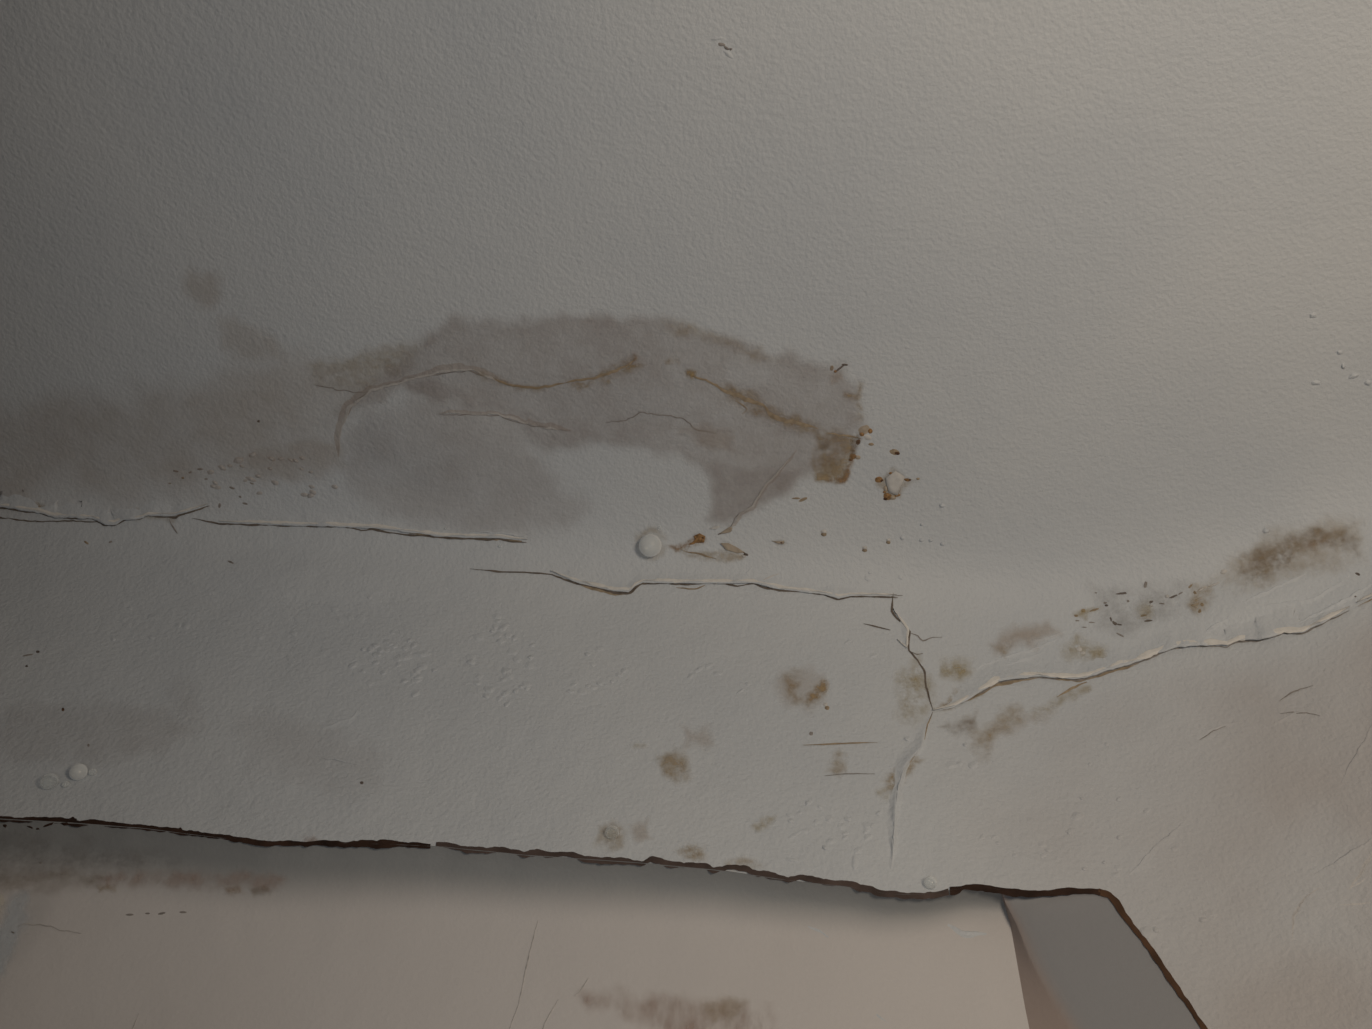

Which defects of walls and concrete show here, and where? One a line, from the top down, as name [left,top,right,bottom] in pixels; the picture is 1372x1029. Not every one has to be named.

crack [607,412,715,434]
crack [687,373,861,527]
crack [0,489,1372,871]